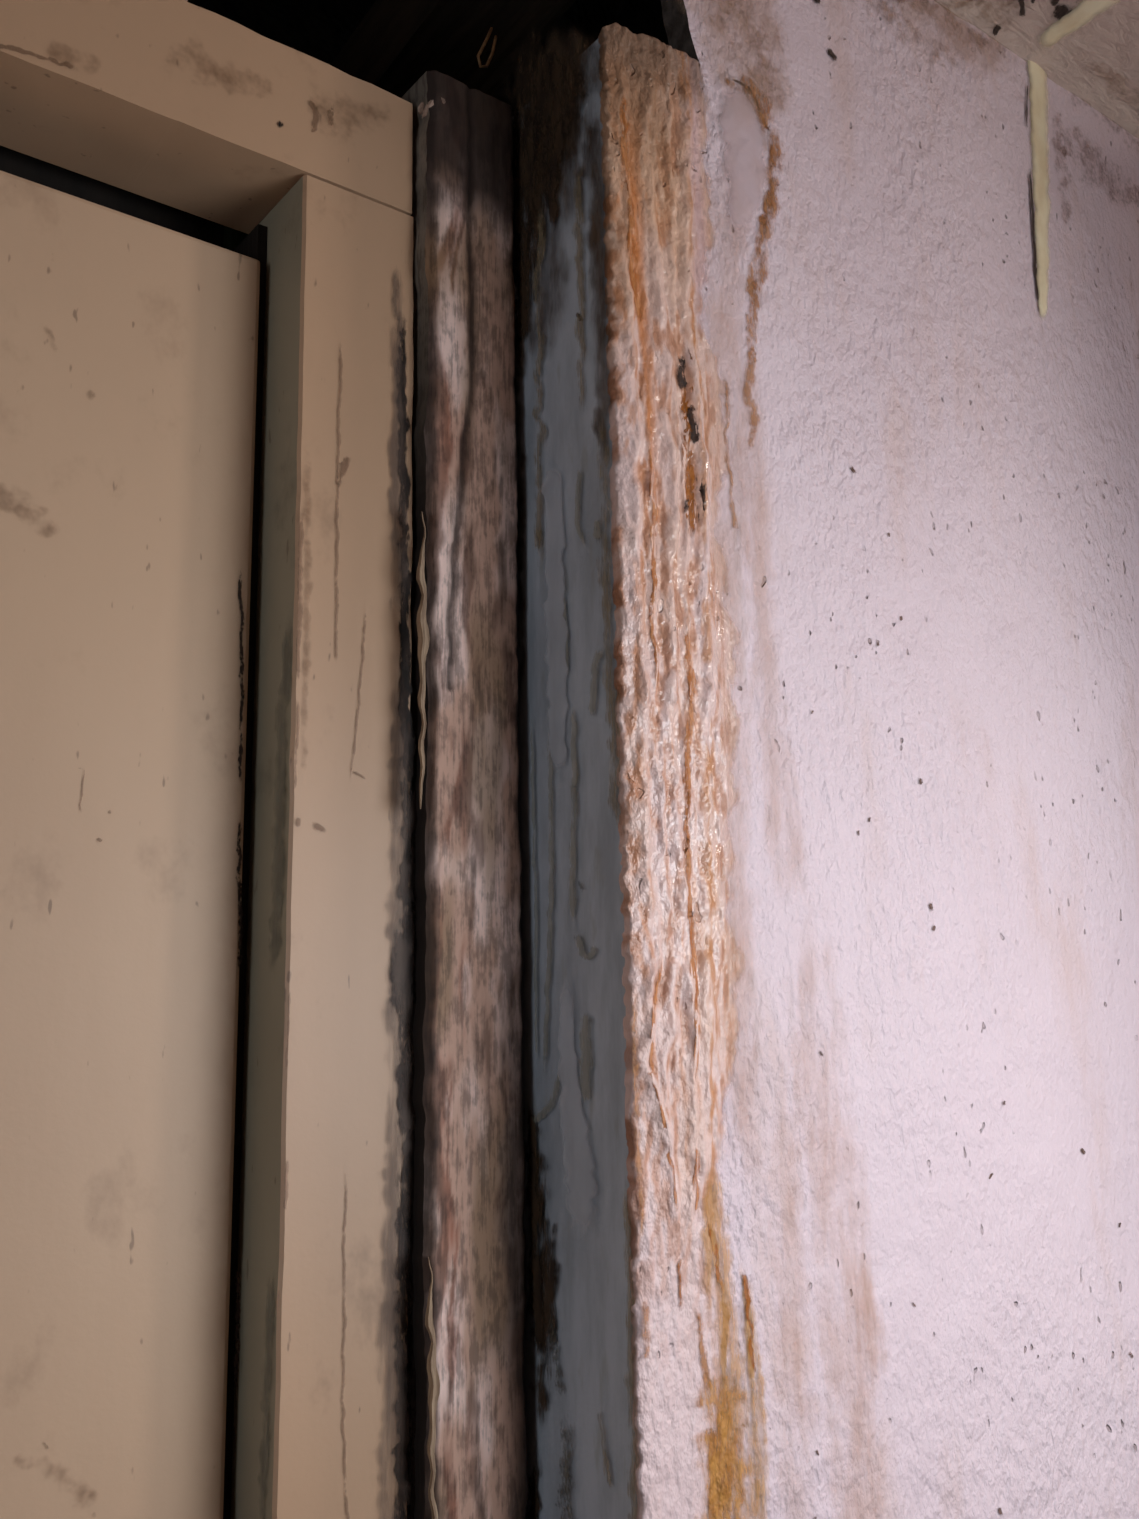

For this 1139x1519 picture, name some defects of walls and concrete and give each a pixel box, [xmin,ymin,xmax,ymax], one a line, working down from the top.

water stain [512,30,620,819]
water stain [727,464,738,528]
water stain [724,76,781,445]
water stain [385,277,417,1519]
peeling [530,472,601,1215]
corrosion [632,1009,645,1233]
corrosion [697,1183,767,1519]